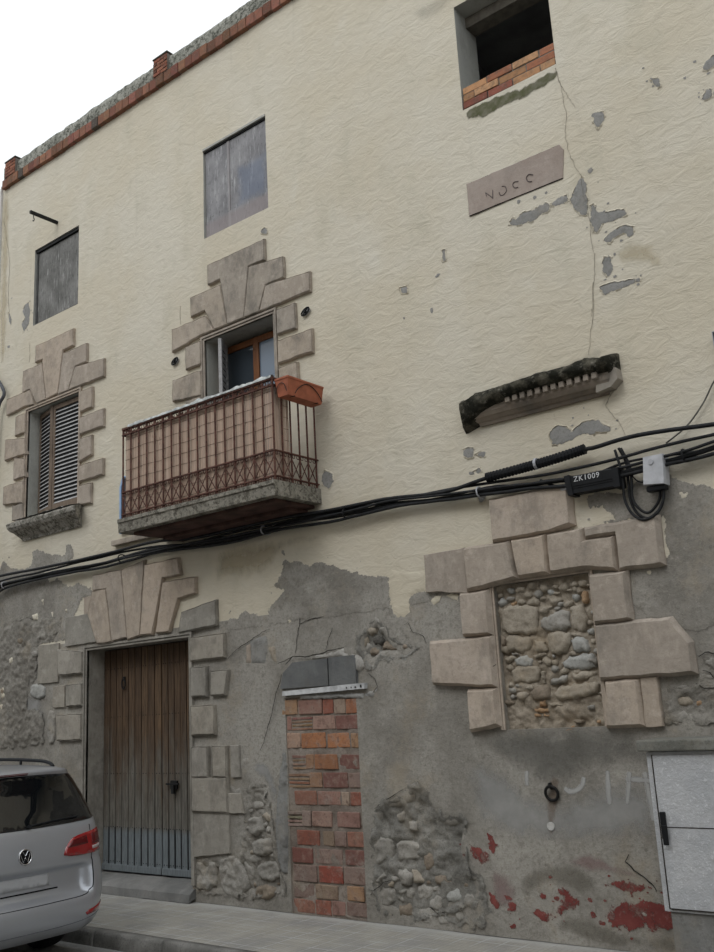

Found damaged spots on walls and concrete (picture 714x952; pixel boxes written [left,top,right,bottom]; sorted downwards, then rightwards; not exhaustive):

peeling [693,54,714,74]
peeling [698,87,714,104]
peeling [508,167,642,295]
peeling [548,407,618,447]
spalling [0,544,92,749]
crack [260,616,344,750]
peeling [226,547,418,670]
peeling [409,591,459,605]
spalling [664,656,714,726]
spalling [196,758,287,901]
spalling [369,781,520,931]
peeling [533,875,673,940]